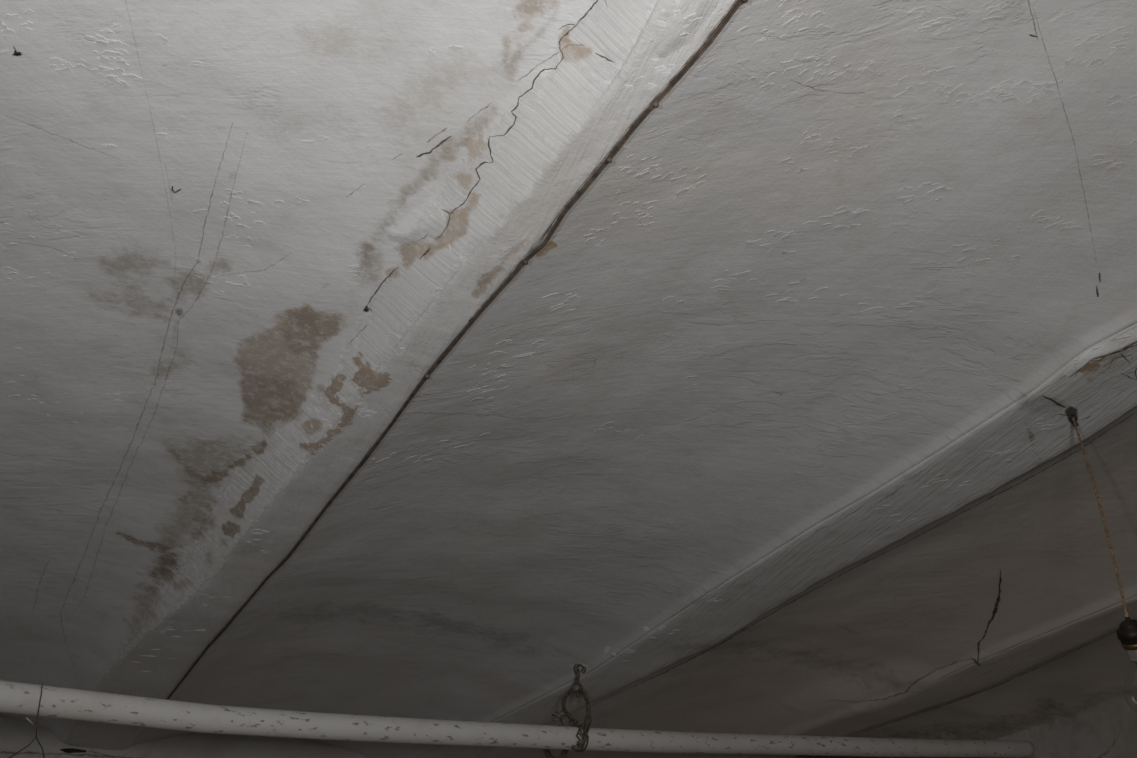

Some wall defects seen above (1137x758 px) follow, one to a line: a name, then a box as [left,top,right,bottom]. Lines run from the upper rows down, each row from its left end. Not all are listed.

crack [366,0,598,311]
water stain [236,307,339,425]
flaking render [300,352,391,455]
peeling [1063,328,1137,378]
crack [1076,344,1137,380]
water stain [222,476,263,536]
crack [586,396,1133,732]